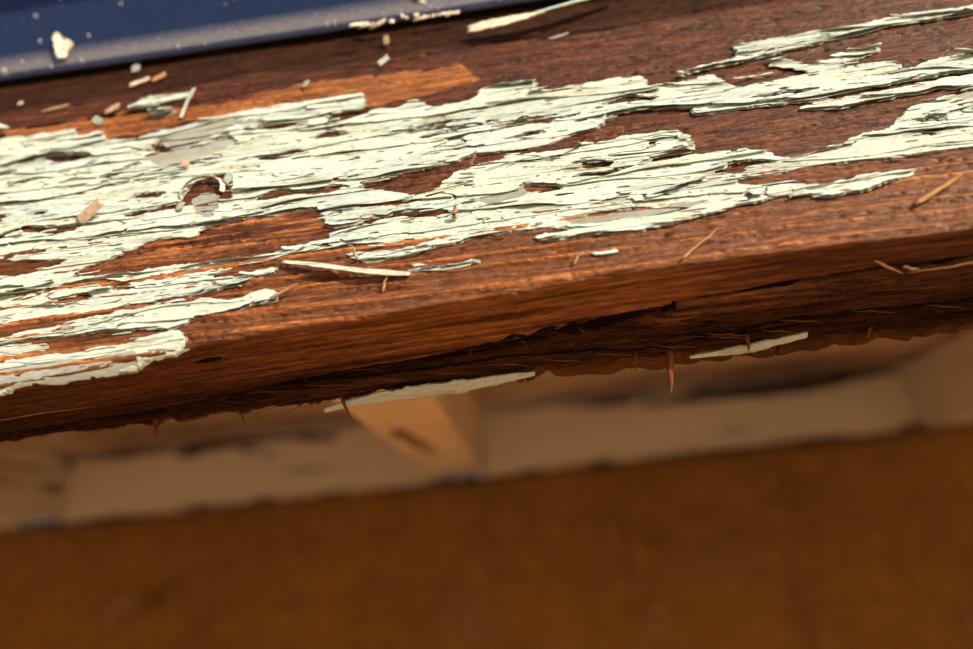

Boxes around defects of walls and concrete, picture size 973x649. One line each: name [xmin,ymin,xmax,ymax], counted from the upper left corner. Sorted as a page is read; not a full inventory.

peeling [0,0,973,397]
crack [249,297,973,393]